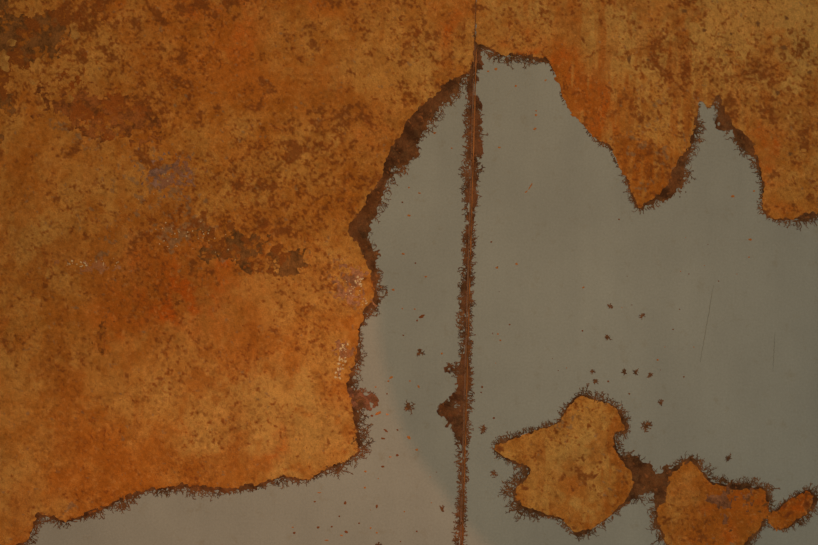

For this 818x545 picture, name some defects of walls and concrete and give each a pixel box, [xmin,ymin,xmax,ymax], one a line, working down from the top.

corrosion [473,0,818,231]
corrosion [0,0,488,545]
peeling [187,217,311,280]
corrosion [490,369,818,545]